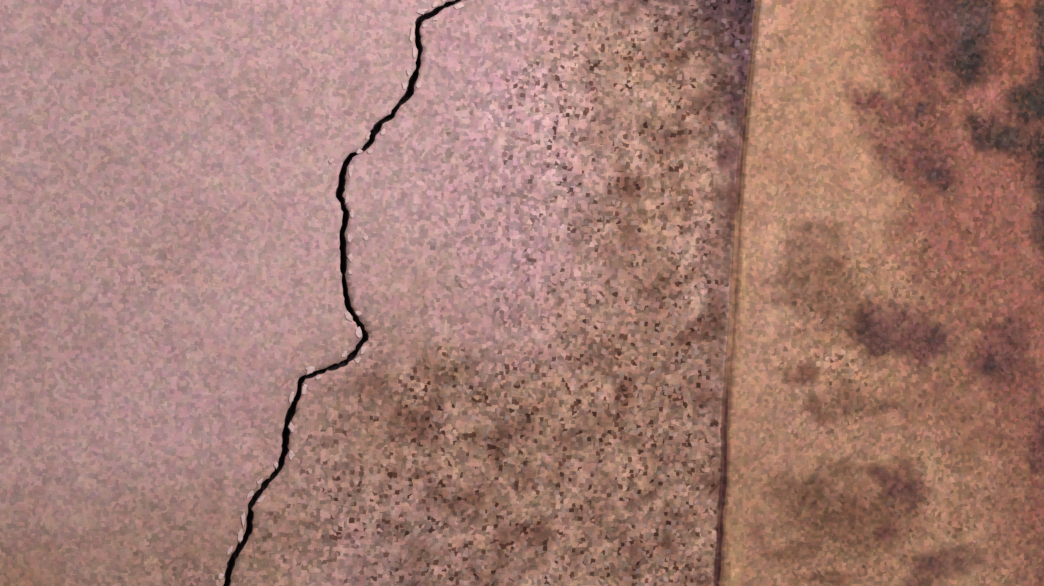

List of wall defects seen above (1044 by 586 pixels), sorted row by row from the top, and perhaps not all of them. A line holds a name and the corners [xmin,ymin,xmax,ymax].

leakage [926,0,998,85]
leakage [680,0,755,225]
leakage [854,94,952,189]
leakage [969,0,1044,244]
crack [218,0,465,586]
leakage [784,261,952,364]
leakage [727,534,741,585]